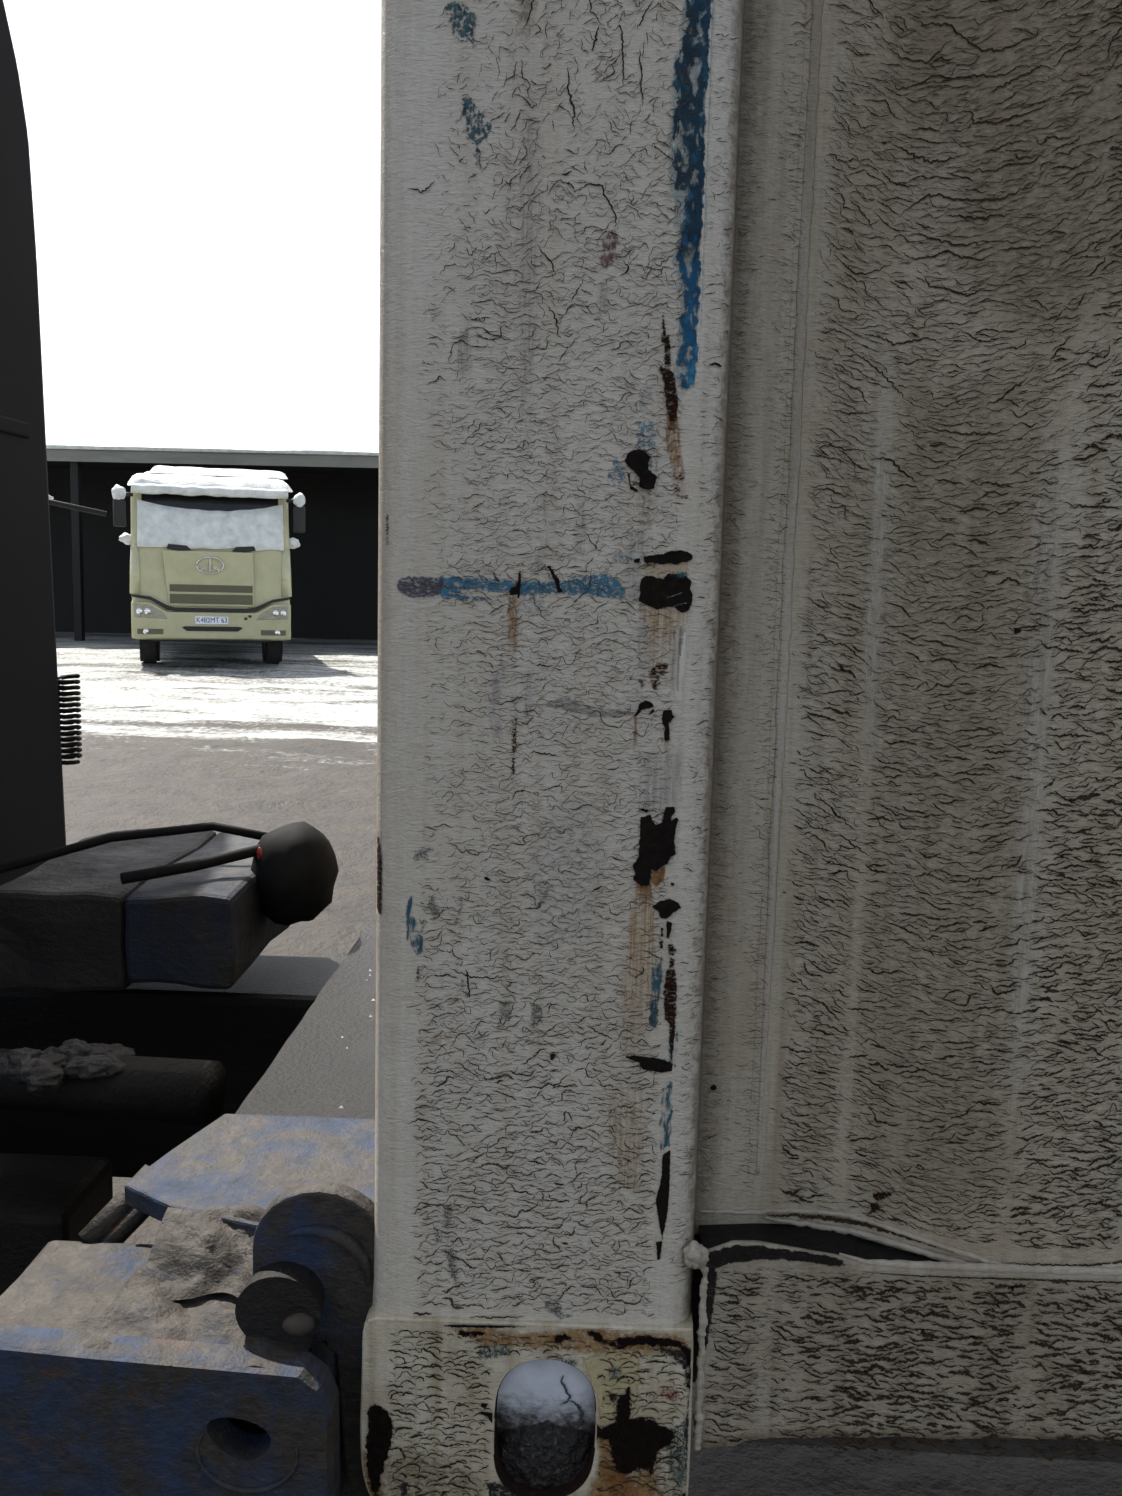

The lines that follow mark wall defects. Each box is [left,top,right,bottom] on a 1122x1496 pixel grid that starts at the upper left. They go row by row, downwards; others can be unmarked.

rust [666,414,688,499]
peeling [614,550,693,613]
peeling [634,700,675,741]
peeling [632,807,678,886]
rust [630,867,665,976]
peeling [652,883,681,969]
rust [663,969,677,1059]
peeling [626,1055,673,1073]
rust [590,1438,661,1496]
peeling [597,1380,675,1475]